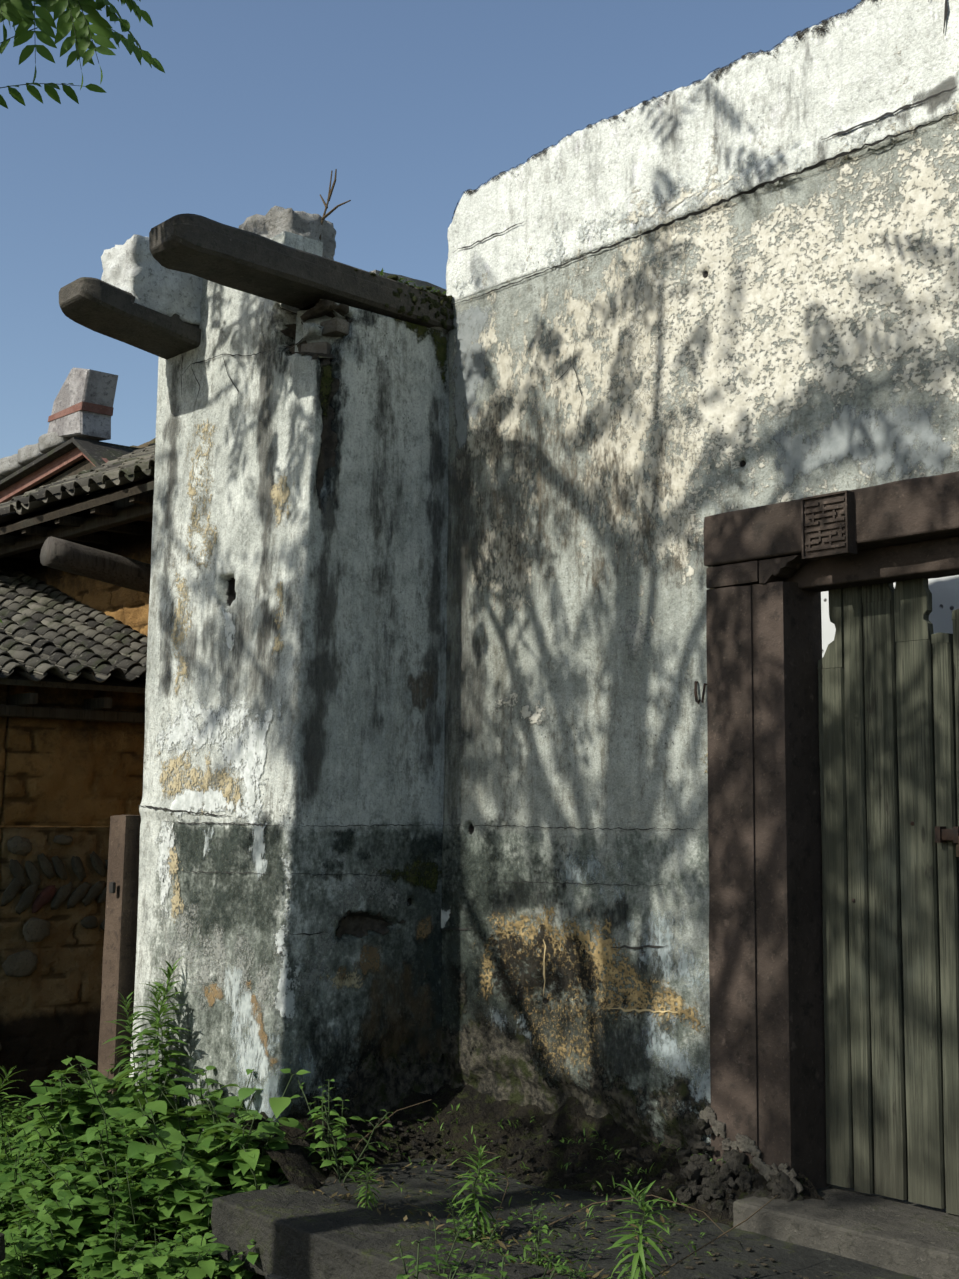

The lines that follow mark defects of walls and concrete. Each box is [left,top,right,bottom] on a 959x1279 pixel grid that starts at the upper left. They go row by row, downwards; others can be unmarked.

crack [928,0,948,33]
crack [181,351,266,404]
water stain [313,309,378,509]
peeling [453,77,959,615]
peeling [156,746,249,816]
water stain [174,818,288,937]
water stain [323,828,371,880]
spalling [335,910,406,938]
flaking render [441,906,451,928]
water stain [402,820,711,1118]
flaking render [474,905,709,1077]
water stain [230,1017,283,1122]